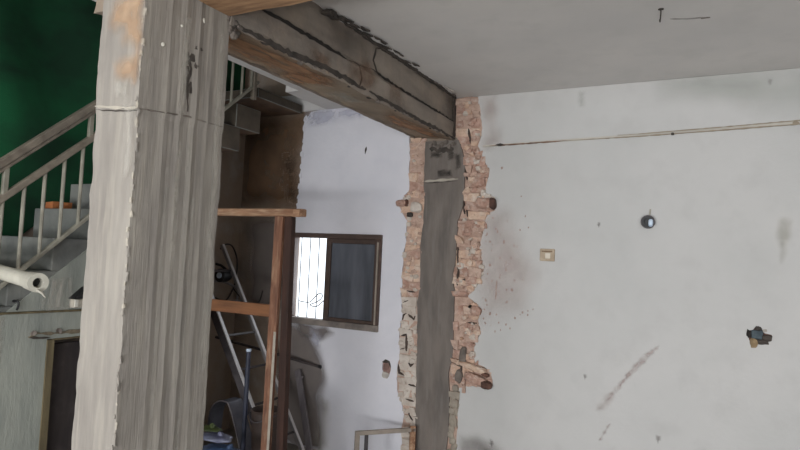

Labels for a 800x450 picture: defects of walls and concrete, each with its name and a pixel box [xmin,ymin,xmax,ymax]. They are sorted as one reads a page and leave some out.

crack [262,9,456,137]
flaking render [227,8,534,450]
spalling [746,326,773,348]